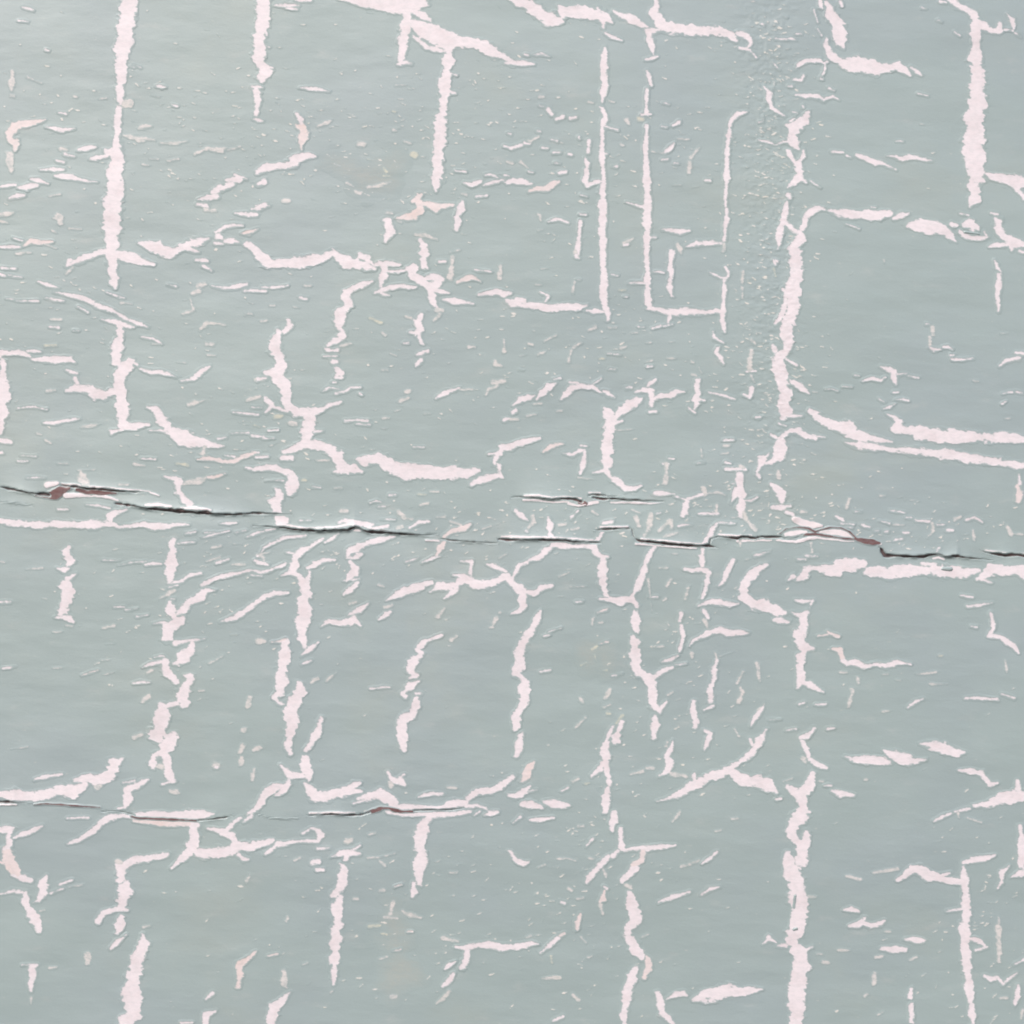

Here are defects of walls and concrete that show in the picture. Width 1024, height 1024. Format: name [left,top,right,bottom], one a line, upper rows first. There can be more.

peeling [451,93,583,234]
peeling [0,110,165,350]
peeling [137,171,314,384]
peeling [651,226,722,299]
peeling [15,388,131,513]
peeling [335,489,493,566]
peeling [778,493,986,563]
crack [0,238,1024,1024]
peeling [687,650,735,753]
peeling [130,815,199,823]
peeling [232,948,294,1024]
peeling [841,904,928,999]